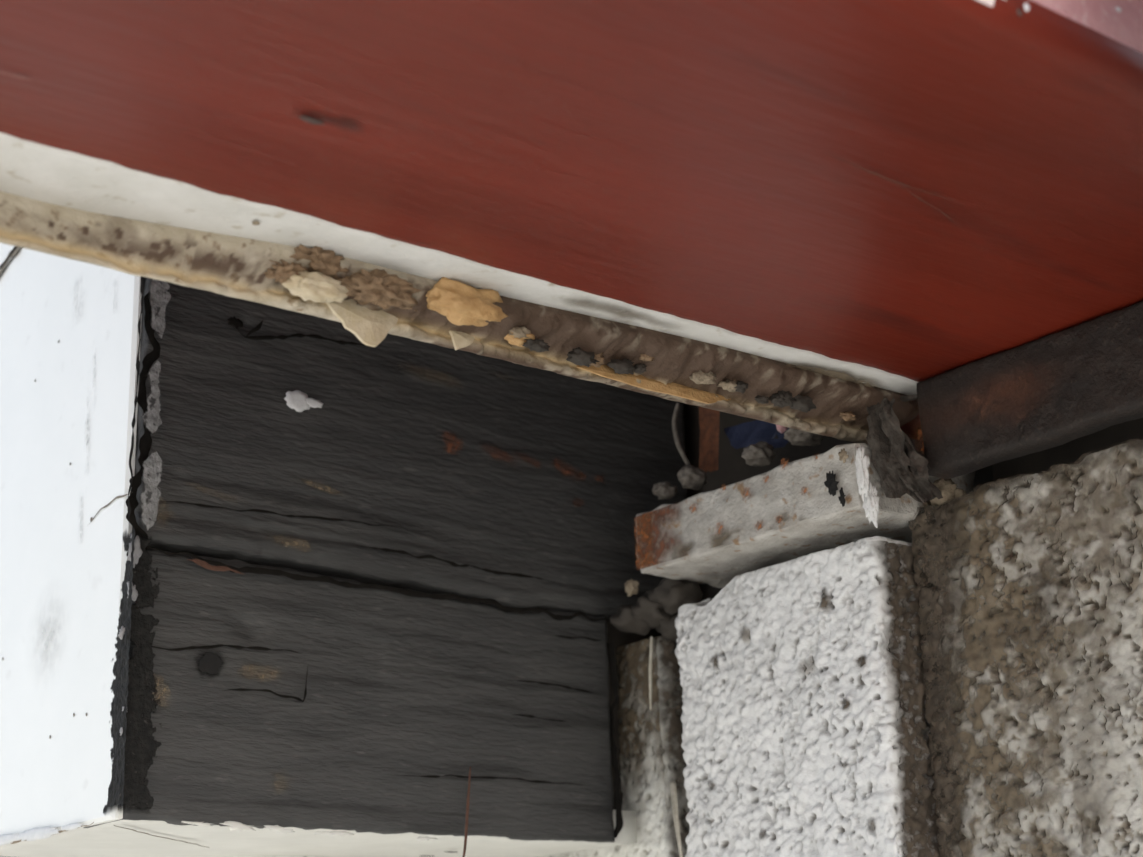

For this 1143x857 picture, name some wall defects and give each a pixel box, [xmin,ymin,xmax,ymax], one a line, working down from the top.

peeling [325,299,398,347]
peeling [449,331,475,350]
peeling [577,365,730,404]
peeling [824,448,849,507]
crack [88,492,133,525]
corrosion [634,504,696,570]
corrosion [712,523,739,548]
crack [126,501,610,641]
water stain [881,439,1143,857]
crack [503,679,601,695]
crack [388,774,581,785]